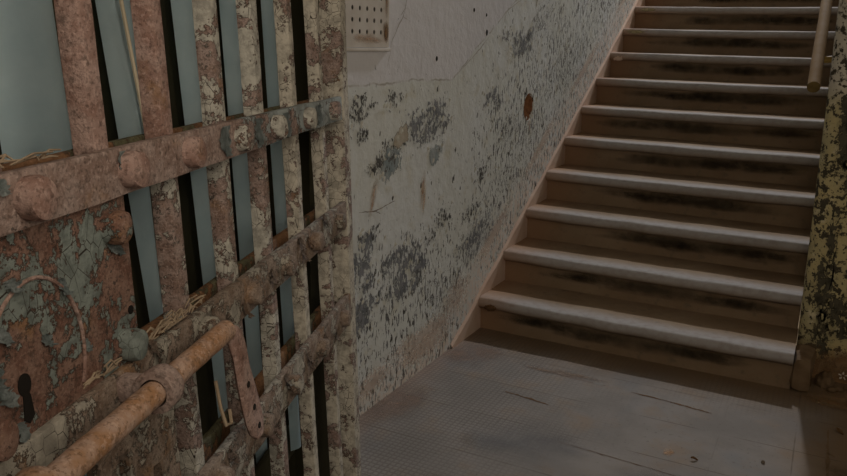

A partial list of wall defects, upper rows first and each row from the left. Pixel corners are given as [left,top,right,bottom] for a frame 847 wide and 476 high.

peeling [349,89,408,144]
peeling [367,91,453,185]
peeling [353,199,503,337]